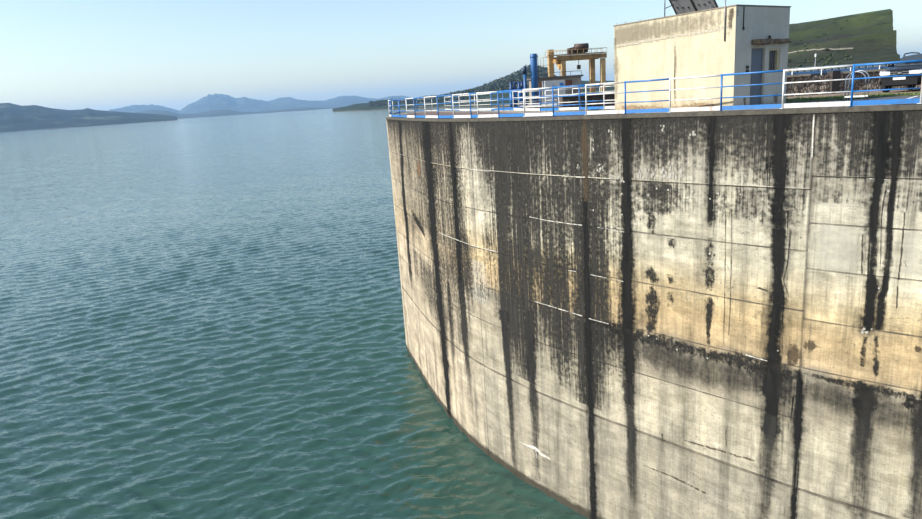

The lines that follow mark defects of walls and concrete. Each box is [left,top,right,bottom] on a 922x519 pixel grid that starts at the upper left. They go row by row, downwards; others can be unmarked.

water stain [387,110,922,519]